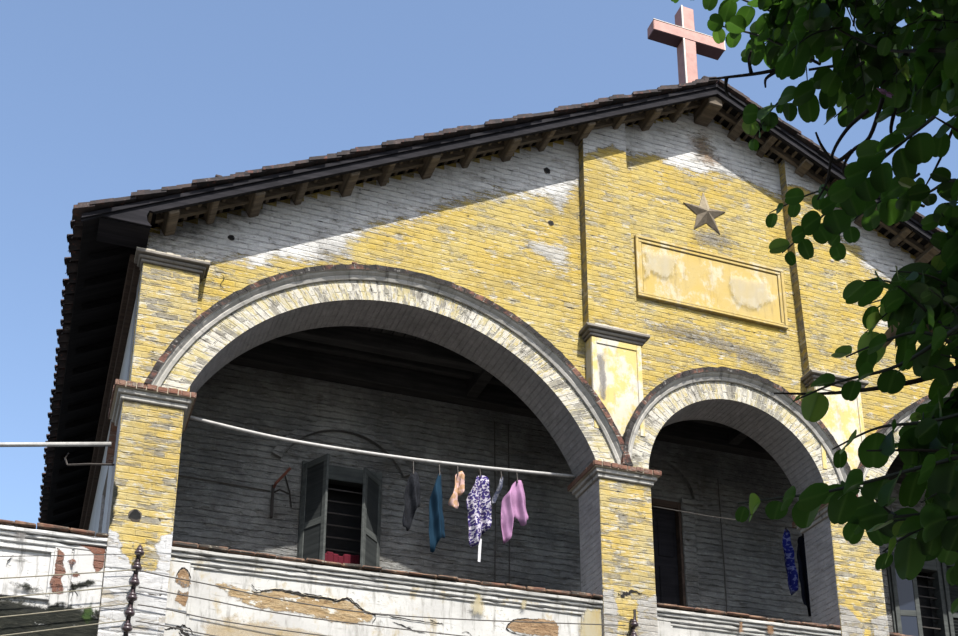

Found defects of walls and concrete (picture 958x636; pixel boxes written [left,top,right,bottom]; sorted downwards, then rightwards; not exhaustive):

peeling [147,113,827,270]
peeling [840,220,915,280]
spalling [50,548,80,594]
peeling [79,530,191,636]
crack [165,624,193,636]
spalling [215,583,376,624]
crack [252,585,472,636]
spalling [506,618,559,636]